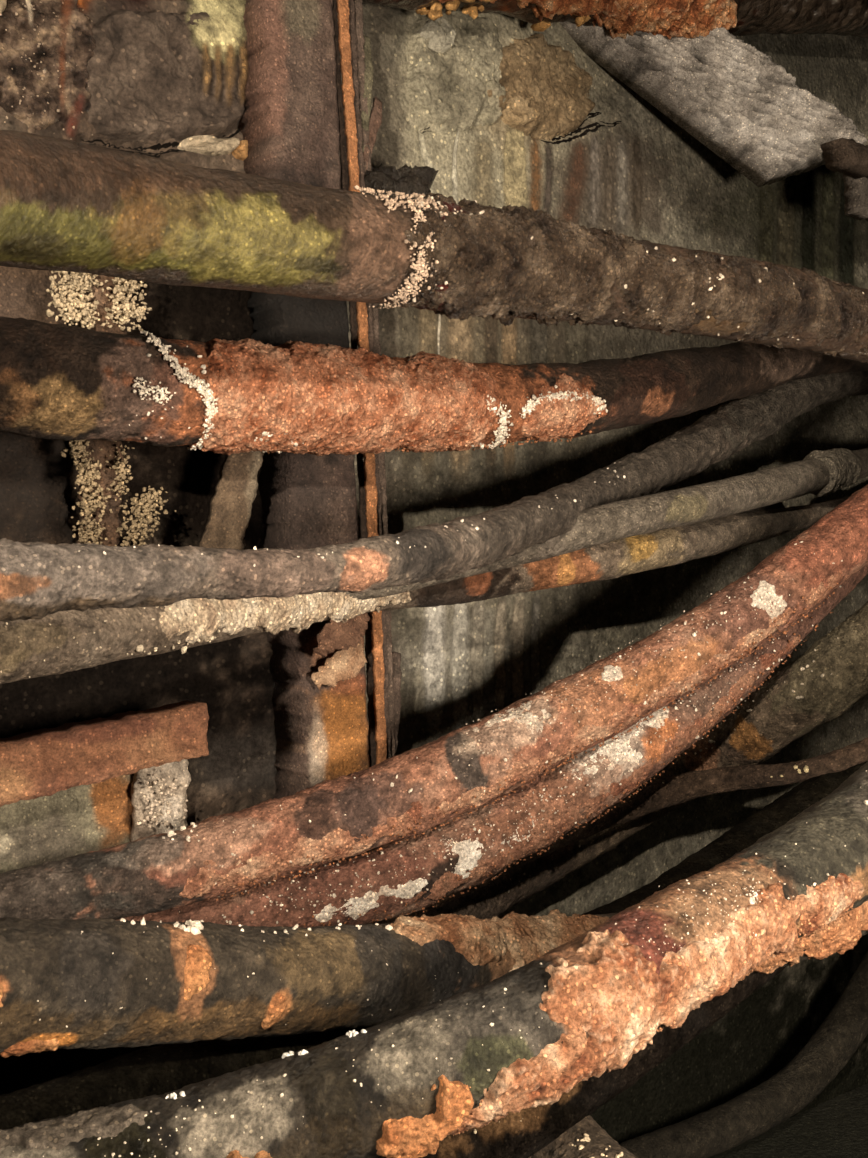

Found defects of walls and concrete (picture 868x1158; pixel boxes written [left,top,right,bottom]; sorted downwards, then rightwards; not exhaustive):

corrosion [333,0,382,193]
corrosion [517,0,737,40]
corrosion [399,141,868,359]
efflorescence [46,271,219,450]
corrosion [189,301,501,539]
corrosion [521,373,607,442]
efflorescence [156,591,412,643]
corrosion [170,570,843,902]
corrosion [0,1039,60,1058]
corrosion [184,944,212,1001]
corrosion [261,993,286,1030]
corrosion [376,873,868,1158]